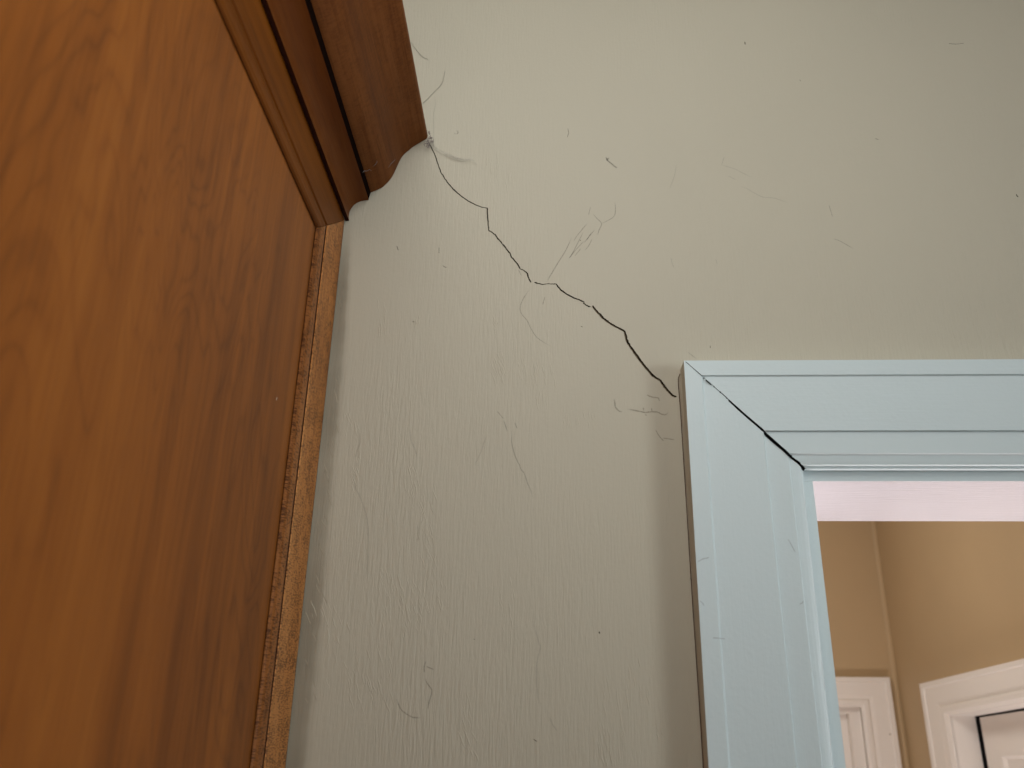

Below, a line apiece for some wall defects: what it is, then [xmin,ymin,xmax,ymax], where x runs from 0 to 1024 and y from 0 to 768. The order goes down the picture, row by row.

crack [428,141,677,398]